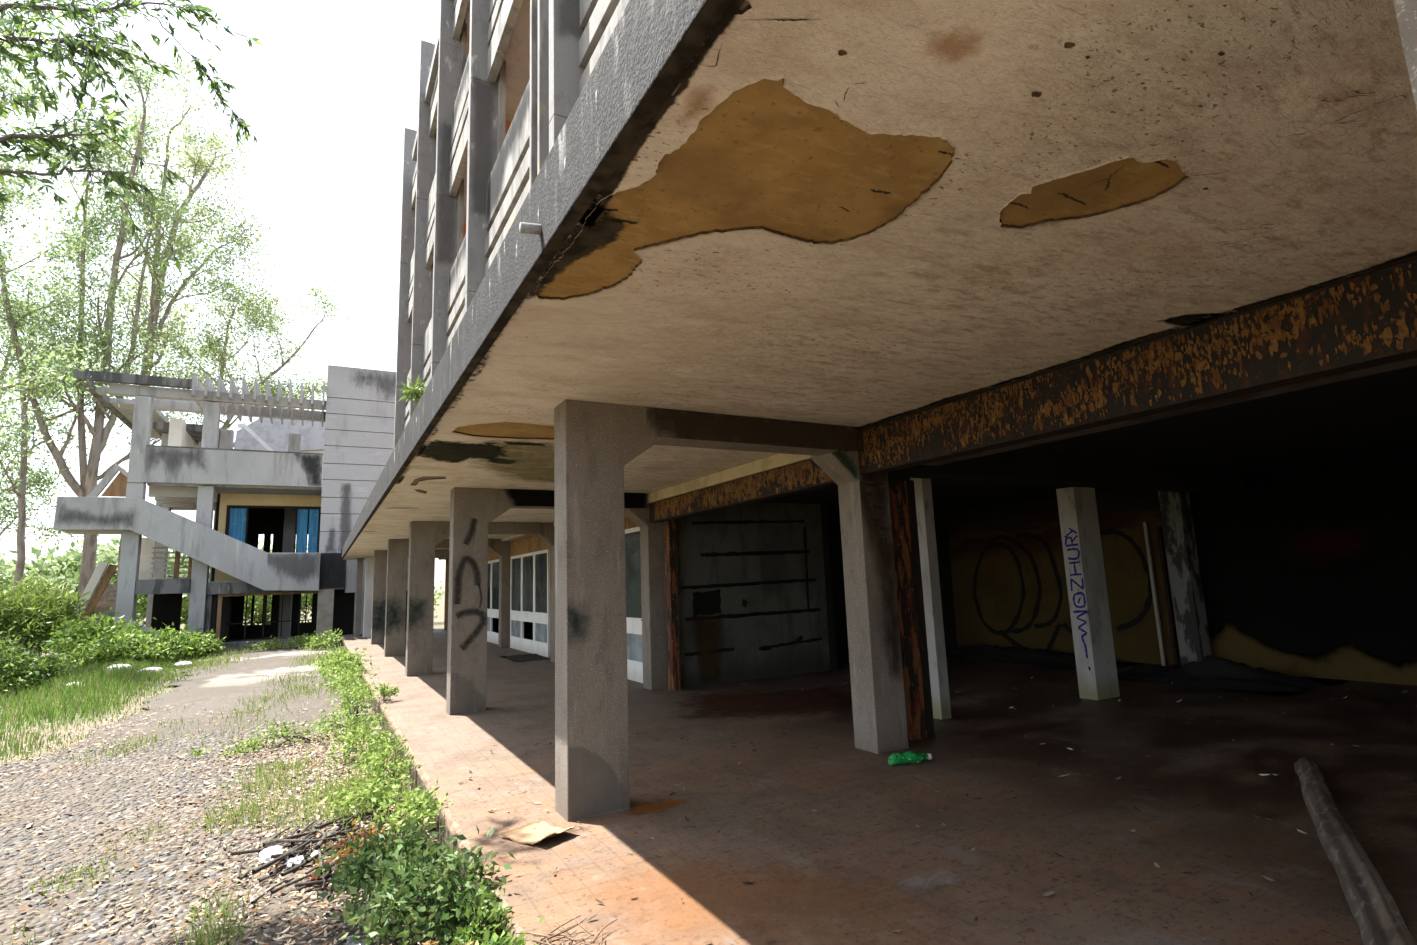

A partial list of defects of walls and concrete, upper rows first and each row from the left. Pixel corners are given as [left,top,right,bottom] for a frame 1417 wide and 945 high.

flaking render [536,74,956,301]
flaking render [998,156,1193,230]
damp [267,0,746,589]
flaking render [451,421,554,440]
damp [648,407,864,452]
damp [150,449,202,468]
damp [61,512,132,524]